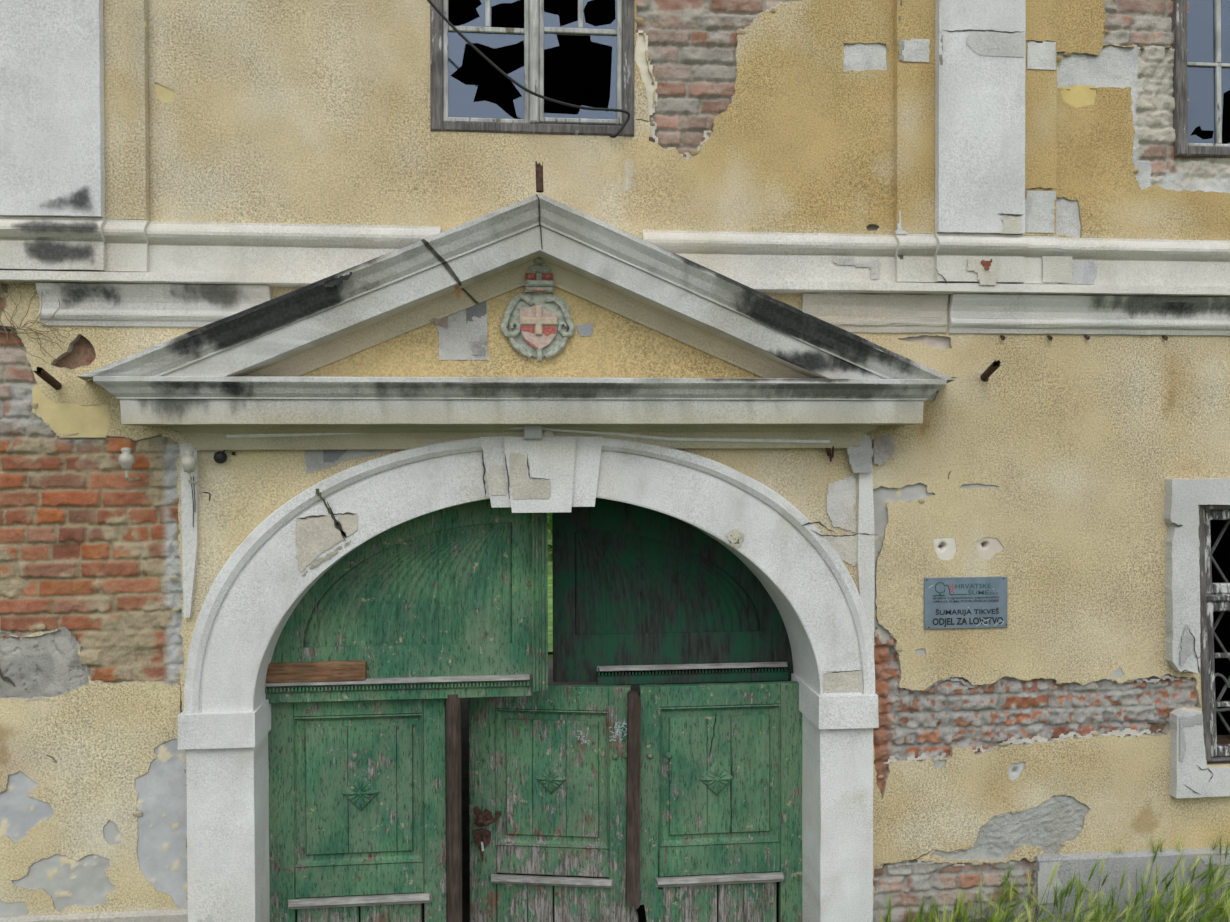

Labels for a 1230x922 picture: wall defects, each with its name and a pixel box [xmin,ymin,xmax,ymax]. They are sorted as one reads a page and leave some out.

flaking render [634,0,803,160]
flaking render [1057,0,1230,193]
water stain [172,260,371,354]
water stain [376,382,452,391]
water stain [473,383,632,397]
water stain [679,255,910,398]
water stain [1095,296,1230,315]
flaking render [0,284,184,685]
flaking render [826,434,894,532]
flaking render [873,603,1203,795]
peeling [132,739,188,909]
flaking render [873,795,1090,922]